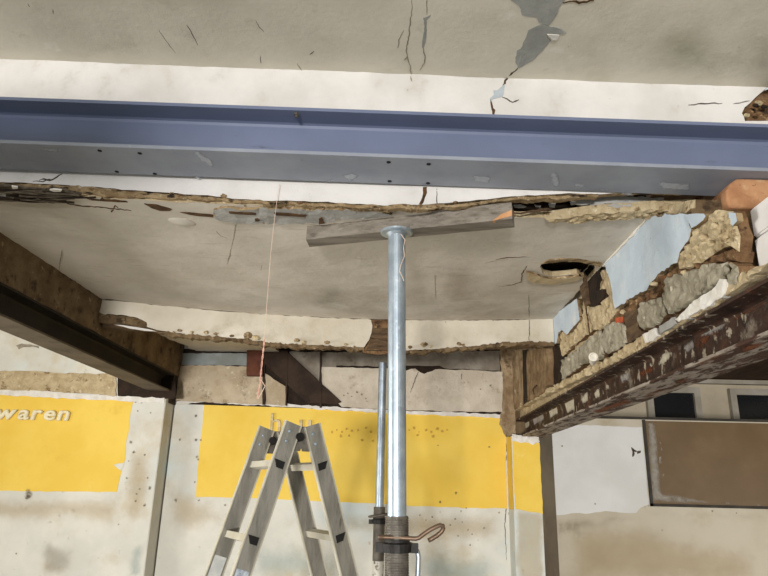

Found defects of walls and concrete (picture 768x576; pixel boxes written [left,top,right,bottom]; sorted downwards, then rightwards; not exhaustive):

crack [398,0,427,91]
peeling [511,0,566,69]
crack [691,99,748,107]
spalling [742,89,768,121]
peeling [0,183,755,357]
crack [487,257,530,336]
peeling [512,385,609,445]